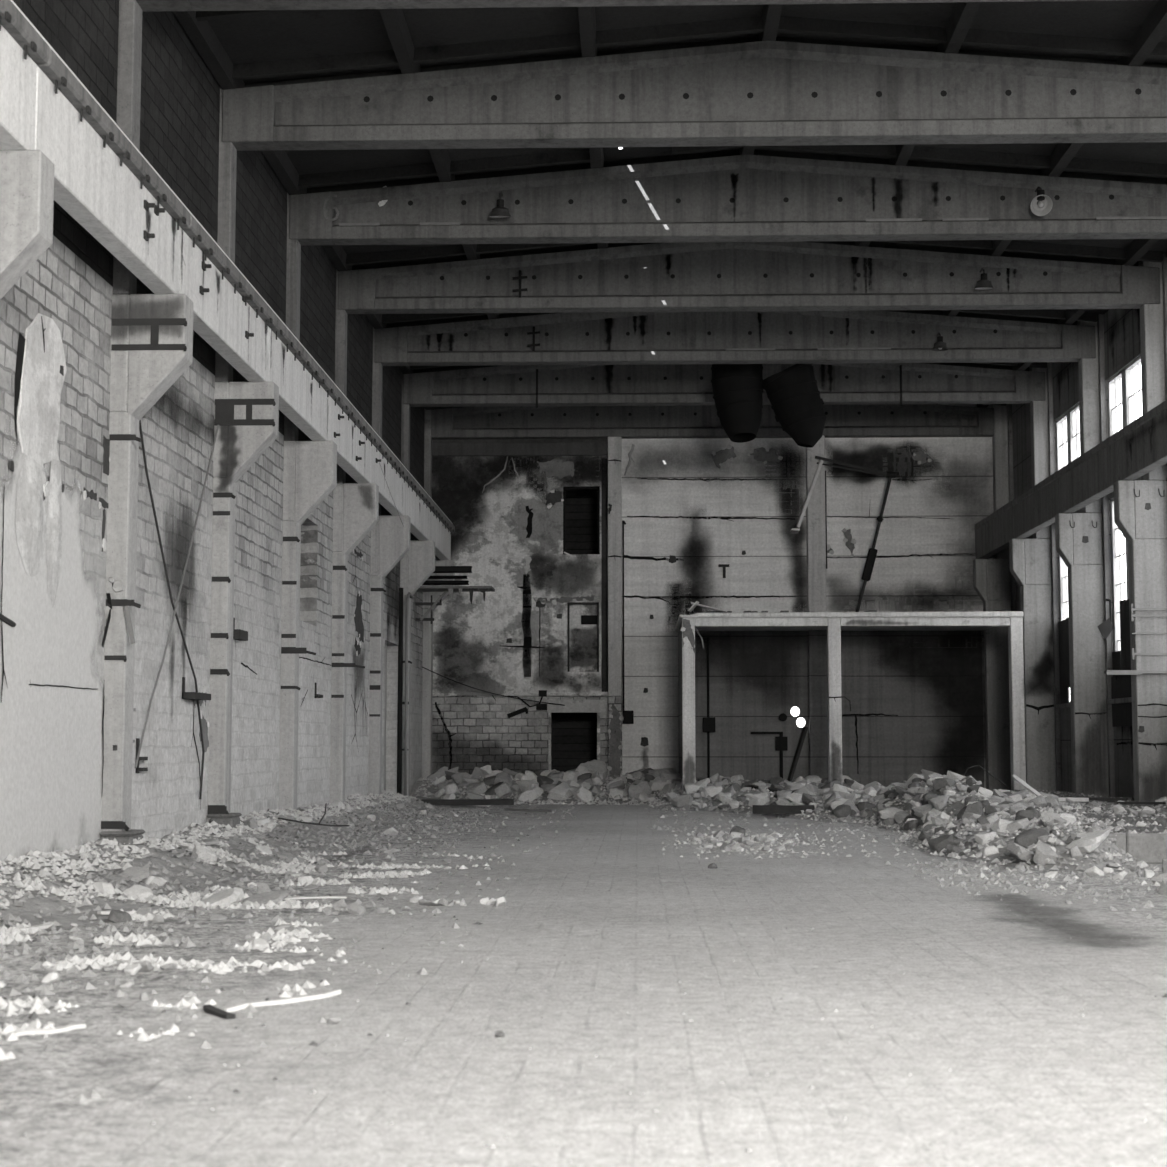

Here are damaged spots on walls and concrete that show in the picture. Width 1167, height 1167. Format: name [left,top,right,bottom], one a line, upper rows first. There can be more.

water stain [894,179,903,218]
water stain [852,257,872,293]
water stain [155,385,238,491]
water stain [432,456,608,553]
water stain [530,556,593,595]
crack [608,554,684,562]
water stain [435,630,481,688]
water stain [525,630,597,688]